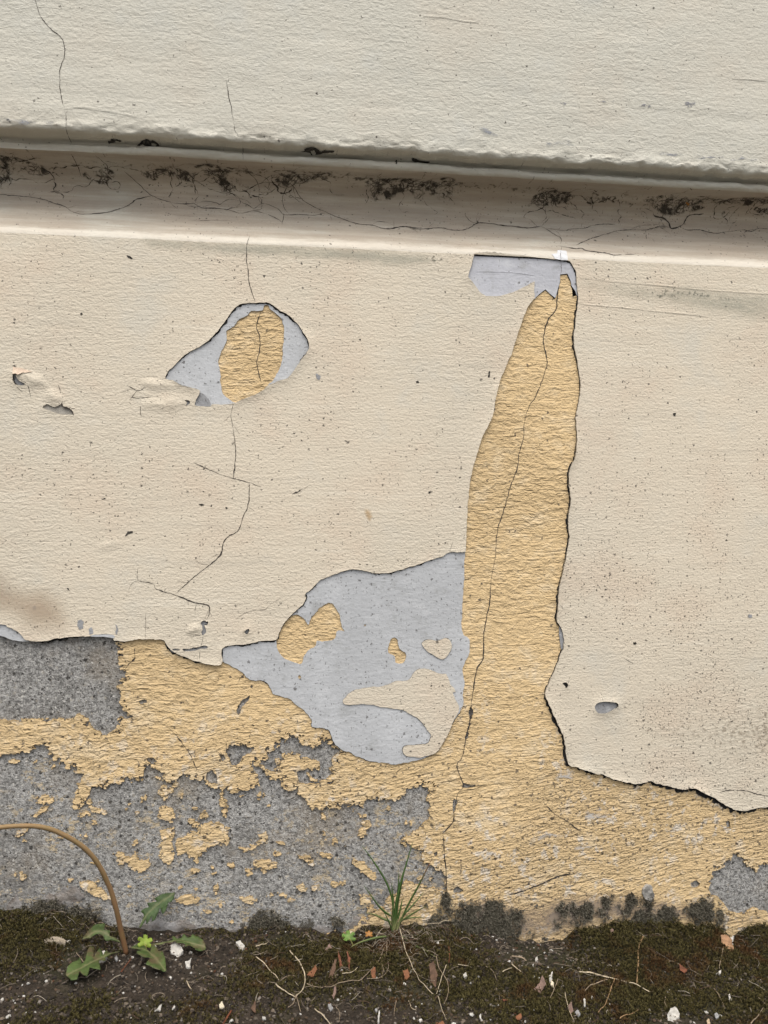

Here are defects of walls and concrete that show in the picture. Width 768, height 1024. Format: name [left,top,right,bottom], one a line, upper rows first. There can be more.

water stain [0,153,331,210]
water stain [366,174,457,213]
water stain [524,187,624,221]
water stain [643,188,768,237]
crack [0,155,766,890]
peeling [0,252,768,951]